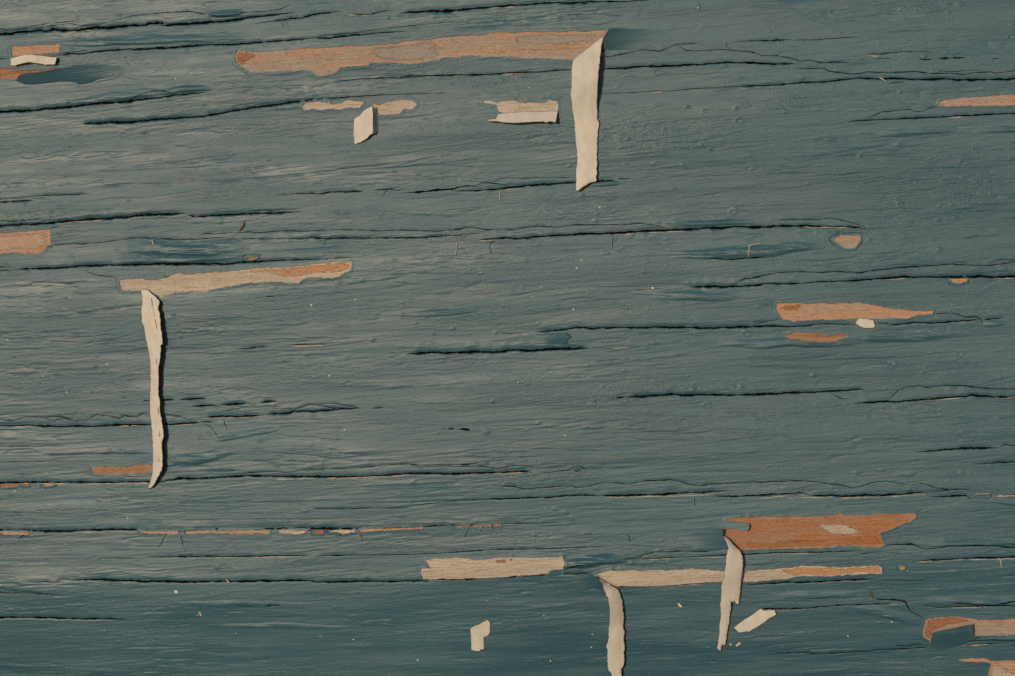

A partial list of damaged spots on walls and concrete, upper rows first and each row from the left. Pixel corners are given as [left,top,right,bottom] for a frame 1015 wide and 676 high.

peeling [0,41,126,84]
crack [0,69,572,124]
crack [0,0,644,59]
peeling [231,26,671,191]
crack [600,37,1015,94]
crack [0,177,865,287]
peeling [772,299,936,345]
peeling [87,254,355,489]
crack [0,398,1015,531]
crack [0,546,721,628]
peeling [417,510,919,676]
peeling [919,613,1015,676]